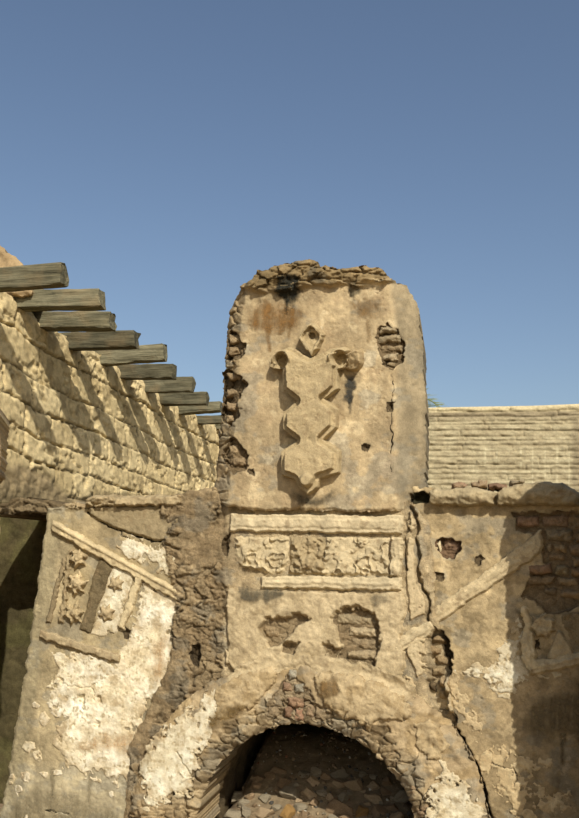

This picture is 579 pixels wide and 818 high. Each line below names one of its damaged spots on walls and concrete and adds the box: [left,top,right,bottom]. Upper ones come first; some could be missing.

water stain [252,298,301,351]
spalling [375,322,405,370]
spalling [221,329,255,476]
water stain [344,376,356,404]
peeling [115,533,175,577]
spalling [435,537,462,559]
spalling [260,614,315,654]
spalling [324,606,380,666]
peeling [9,567,217,813]
peeling [402,617,562,743]
peeling [423,759,488,818]
crack [457,729,518,818]